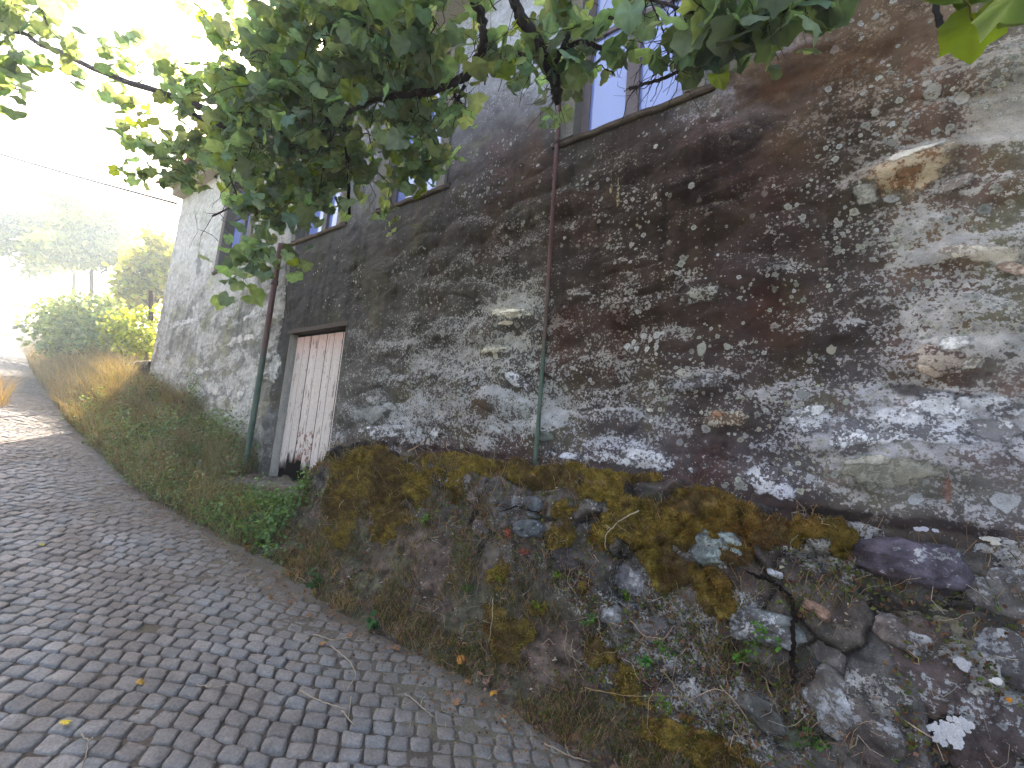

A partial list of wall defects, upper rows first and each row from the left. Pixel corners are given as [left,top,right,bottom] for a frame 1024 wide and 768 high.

flaking render [853,141,974,205]